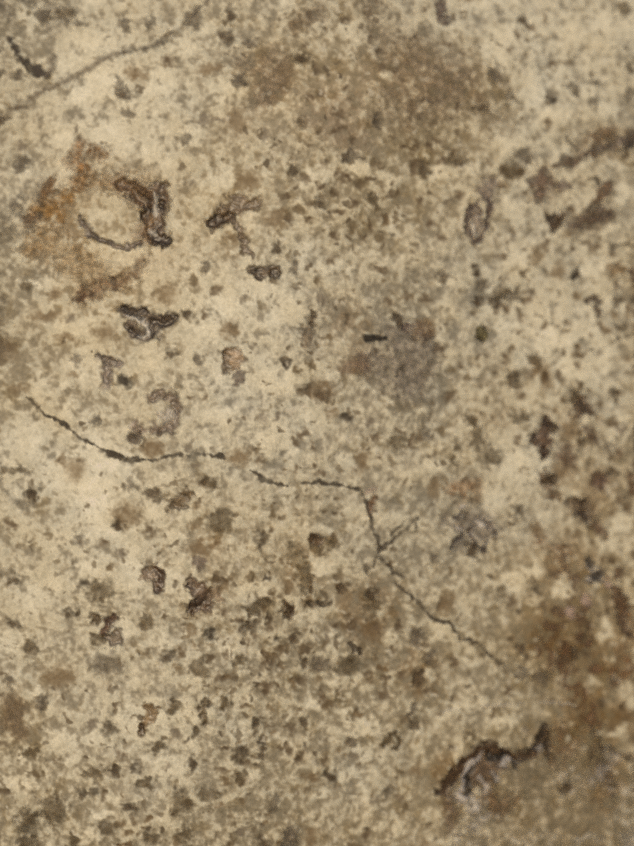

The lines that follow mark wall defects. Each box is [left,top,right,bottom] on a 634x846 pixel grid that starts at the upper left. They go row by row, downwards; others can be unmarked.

crack [29,399,183,462]
crack [203,451,225,459]
crack [252,471,496,660]
spalling [435,723,553,834]